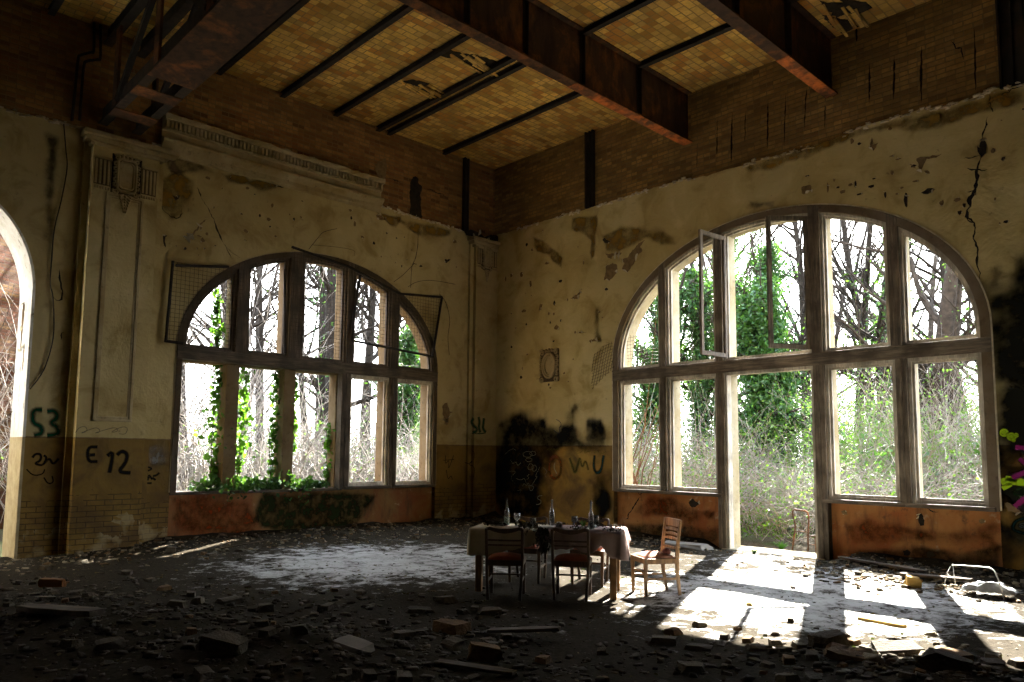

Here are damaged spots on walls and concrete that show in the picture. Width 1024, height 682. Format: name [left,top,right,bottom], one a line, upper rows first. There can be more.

spalling [827,154,976,215]
crack [965,86,1023,279]
spalling [603,238,645,290]